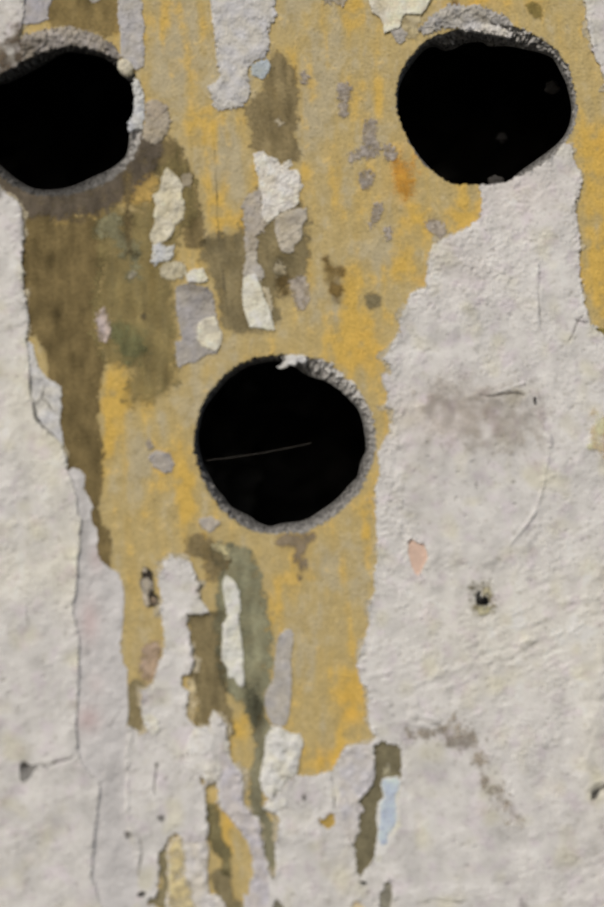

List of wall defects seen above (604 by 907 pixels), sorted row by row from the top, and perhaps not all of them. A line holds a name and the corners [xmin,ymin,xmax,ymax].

peeling [243,252,265,281]
peeling [110,323,147,357]
crack [29,369,59,442]
spalling [140,566,159,608]
spalling [476,588,492,616]
peeling [68,467,146,907]
peeling [181,642,201,726]
spalling [20,762,39,782]
peeling [147,742,269,907]
peeling [216,692,277,879]
peeling [338,741,402,877]
peeling [379,878,393,907]